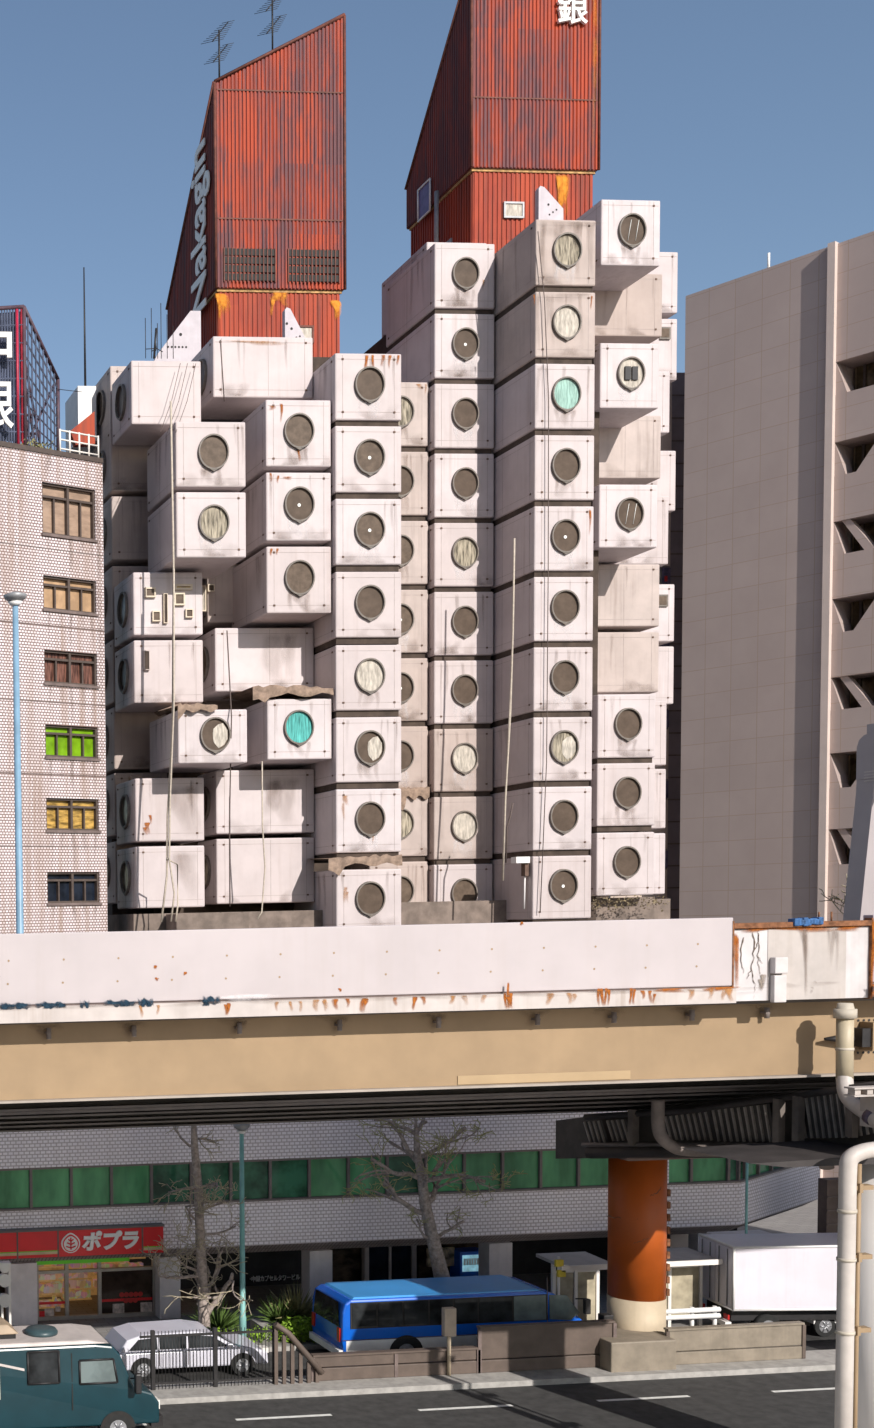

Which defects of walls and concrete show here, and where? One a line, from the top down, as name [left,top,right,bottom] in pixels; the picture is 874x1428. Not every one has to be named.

crack [740,932,762,986]
rust [734,920,874,995]
rust [275,988,368,1009]
rust [504,983,513,1006]
rust [597,988,610,1003]
rust [630,987,734,1002]